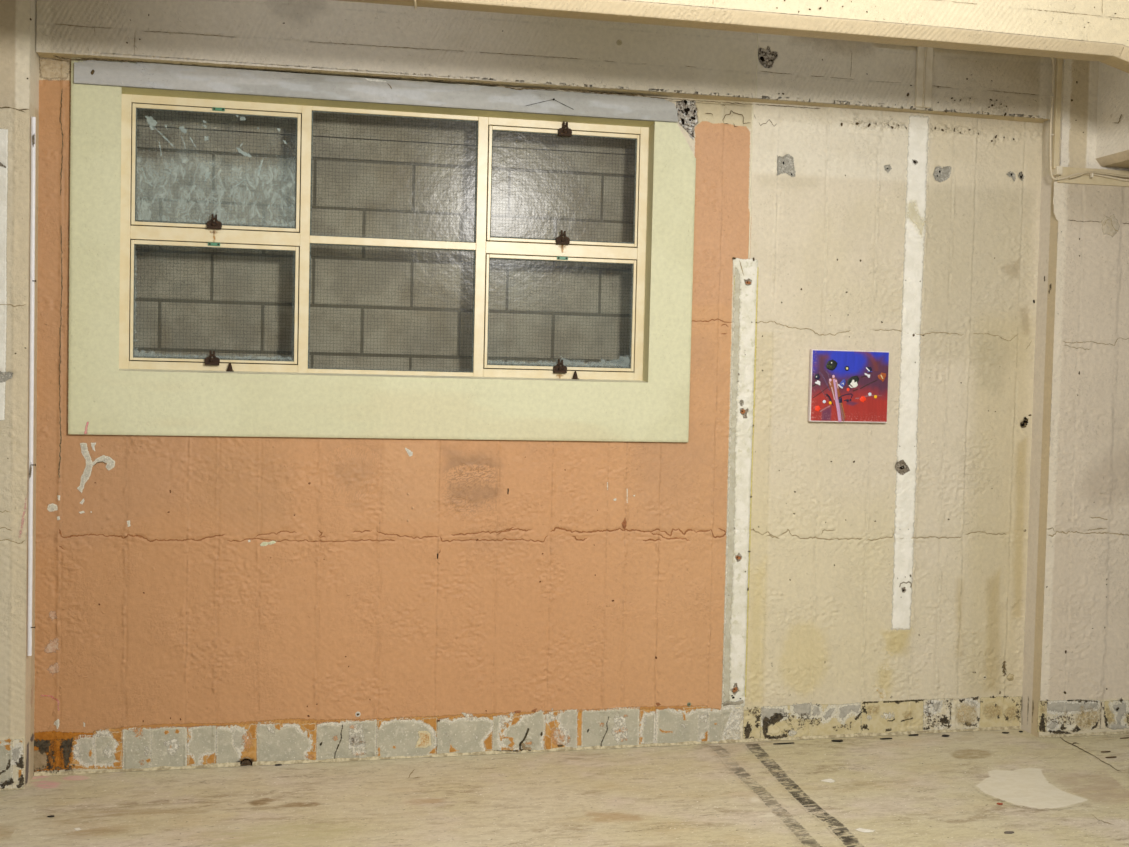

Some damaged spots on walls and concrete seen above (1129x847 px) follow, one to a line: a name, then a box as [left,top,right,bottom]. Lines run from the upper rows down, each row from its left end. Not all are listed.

spalling [758,46,778,68]
spalling [674,90,698,139]
spalling [777,154,795,177]
peeling [841,115,1015,636]
peeling [77,443,115,514]
crack [59,527,1005,554]
crack [1047,517,1129,537]
peeling [69,695,744,770]
peeling [805,697,924,736]
peeling [948,691,1022,730]
peeling [1046,688,1129,734]
peeling [0,738,24,789]